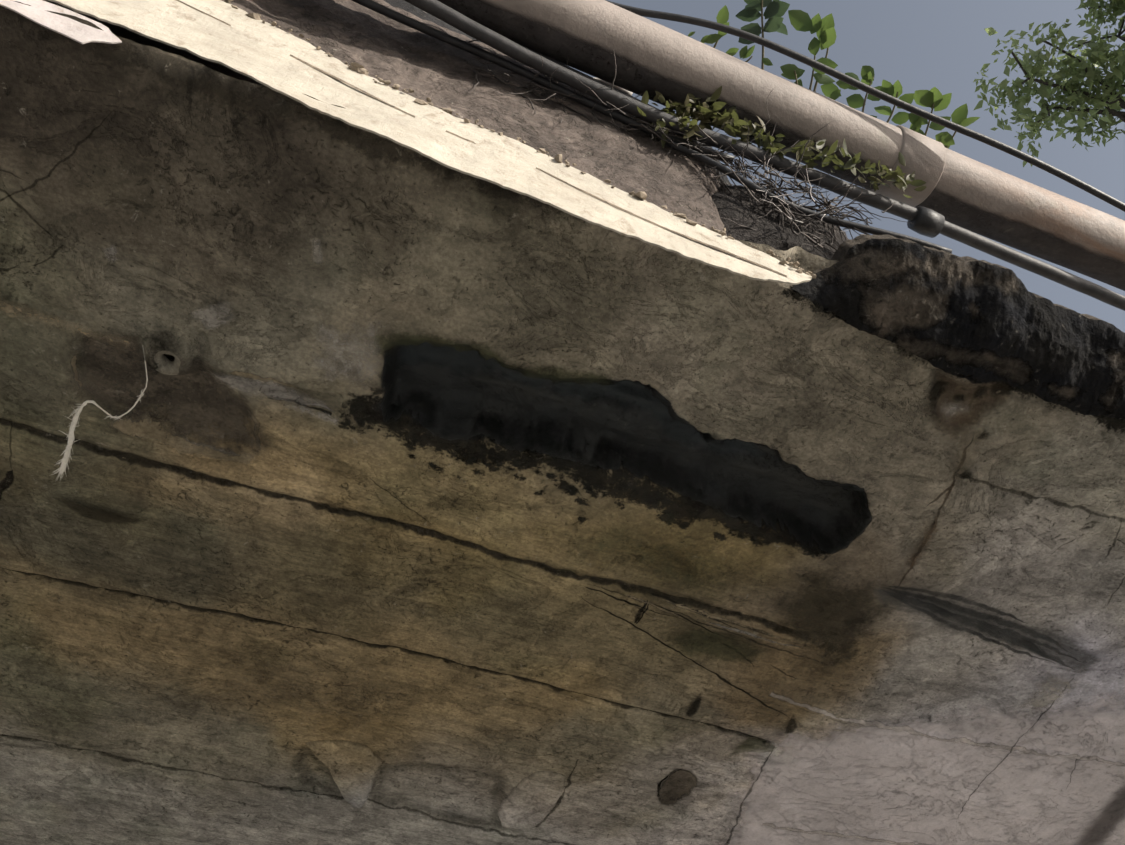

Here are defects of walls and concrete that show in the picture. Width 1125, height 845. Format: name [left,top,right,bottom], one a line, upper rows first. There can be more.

flaking render [0,0,122,44]
spalling [224,0,333,57]
spalling [345,62,586,174]
crack [0,107,118,271]
spalling [629,191,735,240]
spalling [749,243,816,278]
spalling [71,333,872,560]
crack [896,436,974,588]
crack [579,584,823,718]
crack [726,744,775,845]
water stain [729,575,1125,845]
crack [958,674,1075,816]